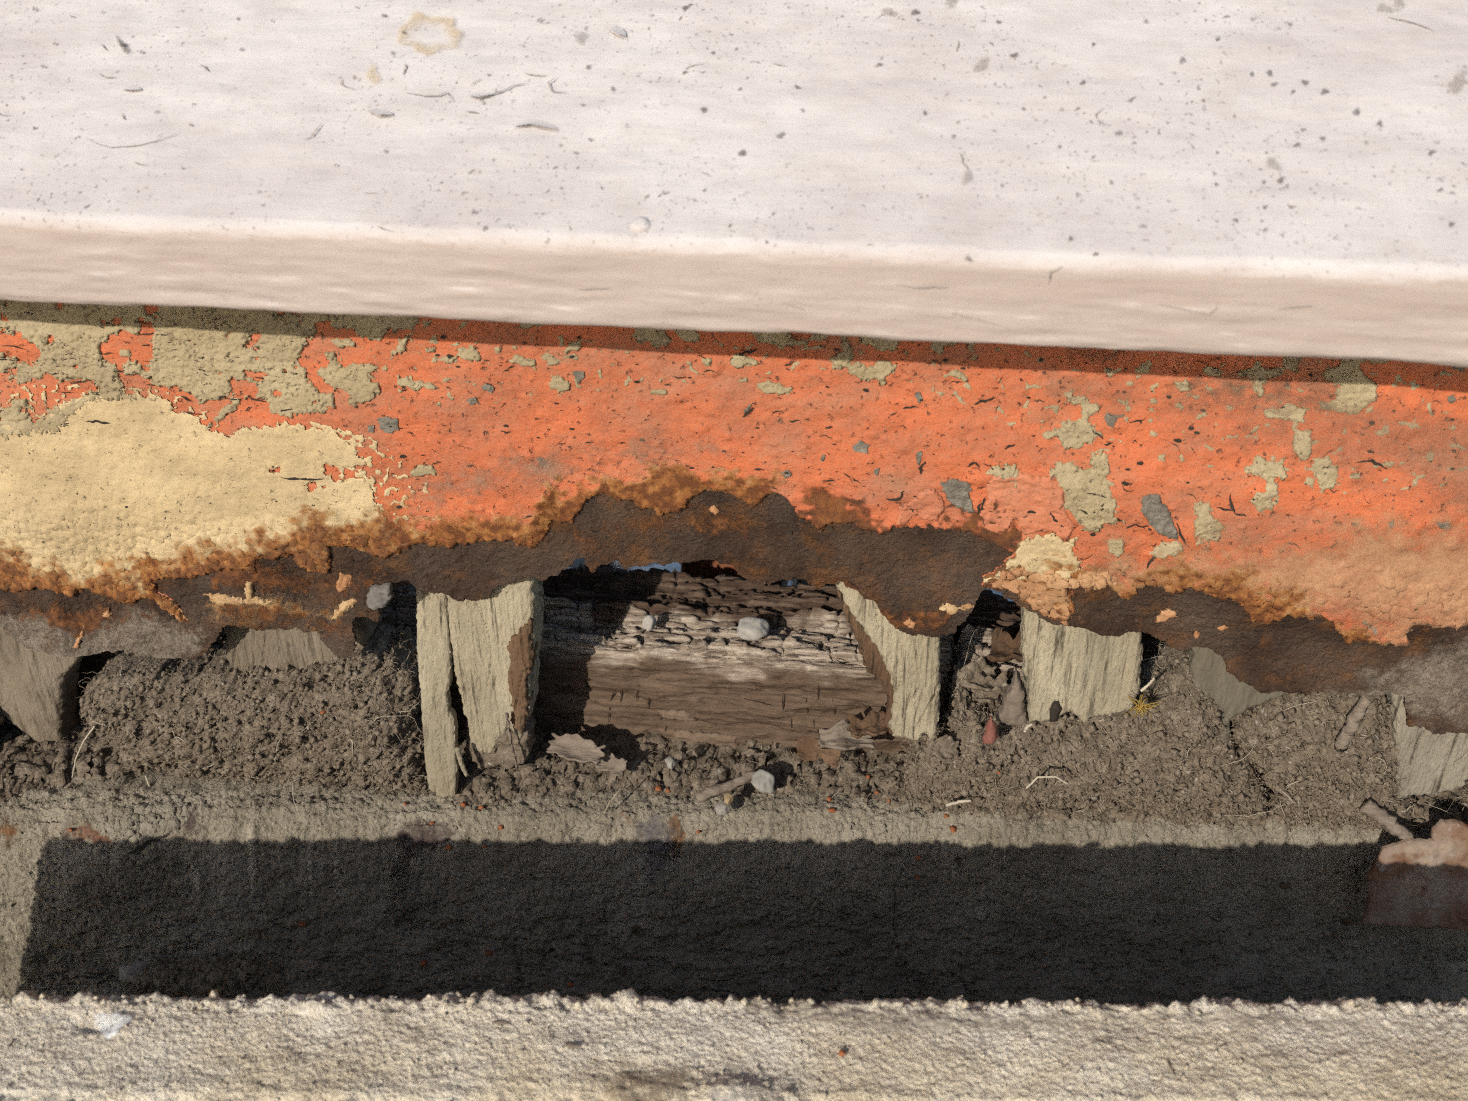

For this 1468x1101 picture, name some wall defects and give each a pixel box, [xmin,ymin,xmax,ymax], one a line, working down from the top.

peeling [367,416,401,434]
peeling [1104,391,1134,429]
peeling [852,441,894,487]
peeling [940,478,975,513]
peeling [1122,461,1189,547]
peeling [203,581,271,607]
peeling [331,560,395,621]
spalling [642,615,656,631]
rust [0,463,1468,734]
peeling [939,603,974,615]
peeling [1156,608,1177,623]